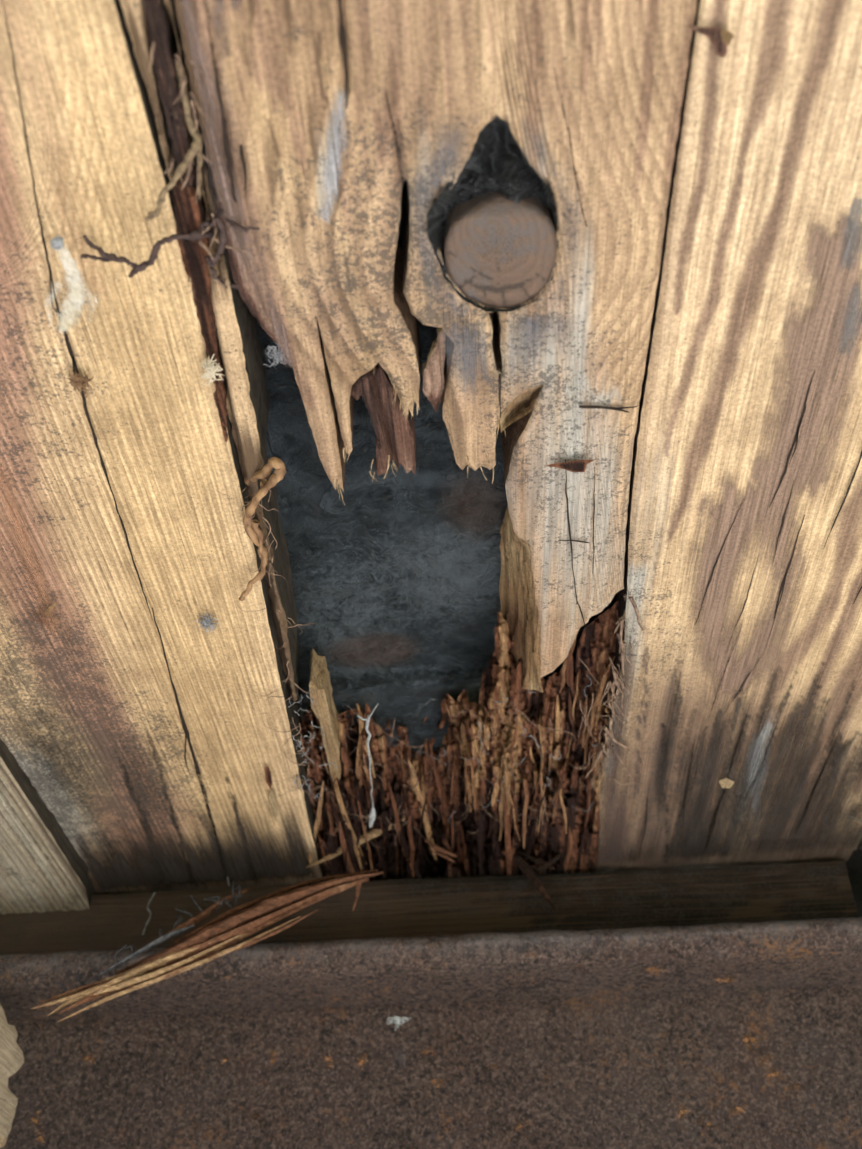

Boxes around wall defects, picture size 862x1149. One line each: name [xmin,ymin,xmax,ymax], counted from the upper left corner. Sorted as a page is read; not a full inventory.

crack [554,69,587,227]
crack [2,0,230,884]
peeling [546,459,595,472]